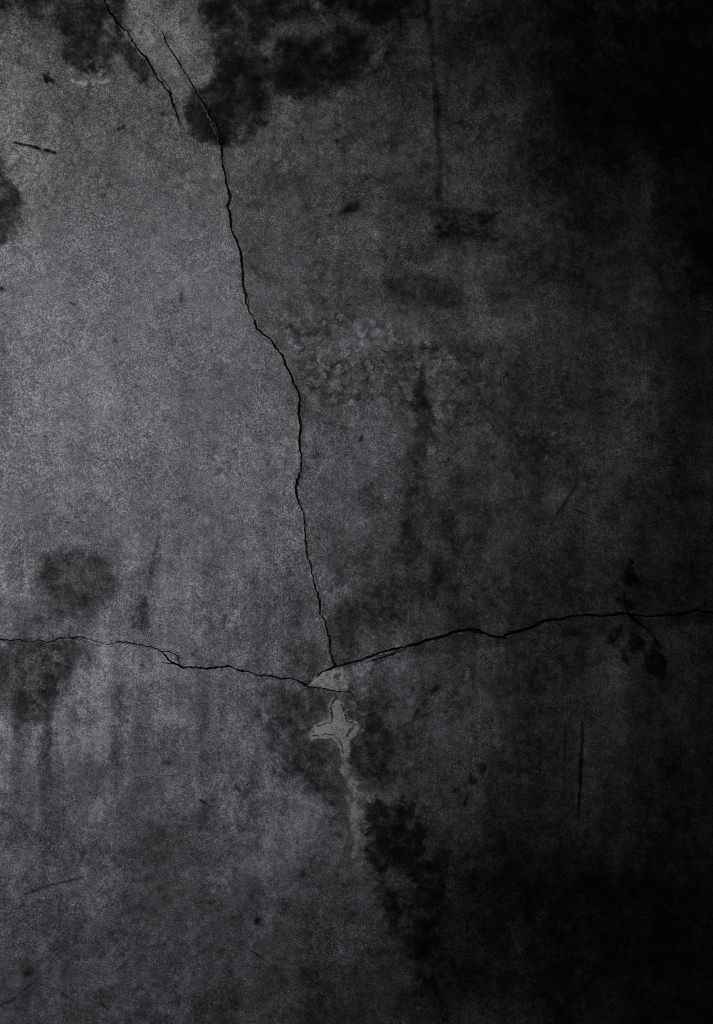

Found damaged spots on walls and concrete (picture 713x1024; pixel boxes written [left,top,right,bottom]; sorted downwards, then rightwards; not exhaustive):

water stain [177,0,504,247]
crack [0,0,713,692]
water stain [247,570,694,1024]